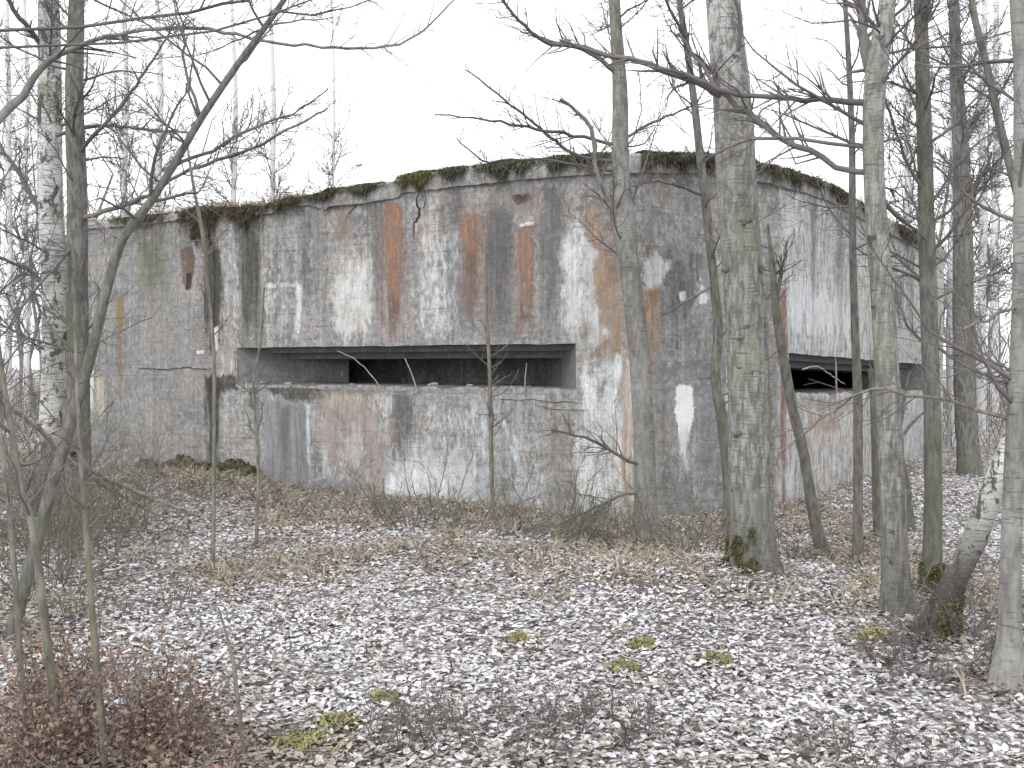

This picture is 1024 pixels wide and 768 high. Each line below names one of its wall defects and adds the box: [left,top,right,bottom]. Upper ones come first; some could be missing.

damp [204,243,223,351]
crack [210,240,218,323]
damp [237,218,303,333]
corrosion [382,202,402,334]
crack [413,195,427,238]
corrosion [516,221,534,336]
crack [139,364,211,372]
damp [204,375,237,464]
corrosion [585,210,634,511]